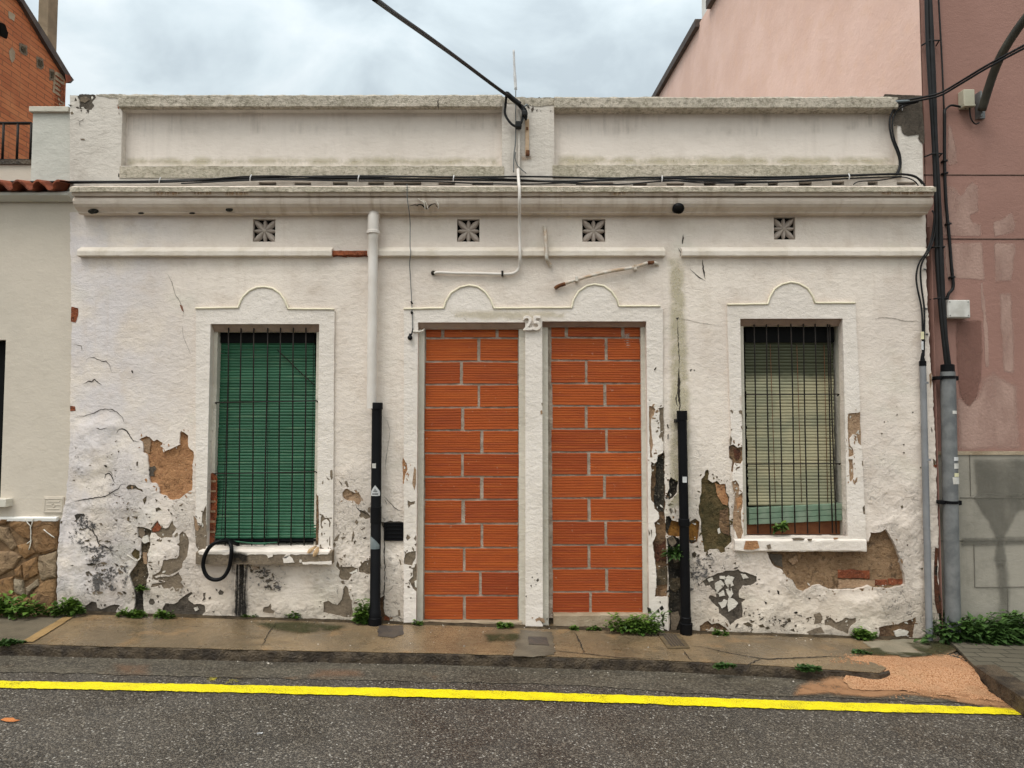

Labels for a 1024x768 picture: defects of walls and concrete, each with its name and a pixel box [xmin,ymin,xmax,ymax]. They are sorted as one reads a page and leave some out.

crack [80,409,134,441]
peeling [84,600,120,612]
flaking render [98,429,224,615]
peeling [315,470,400,617]
flaking render [647,404,908,634]
peeling [875,616,918,638]